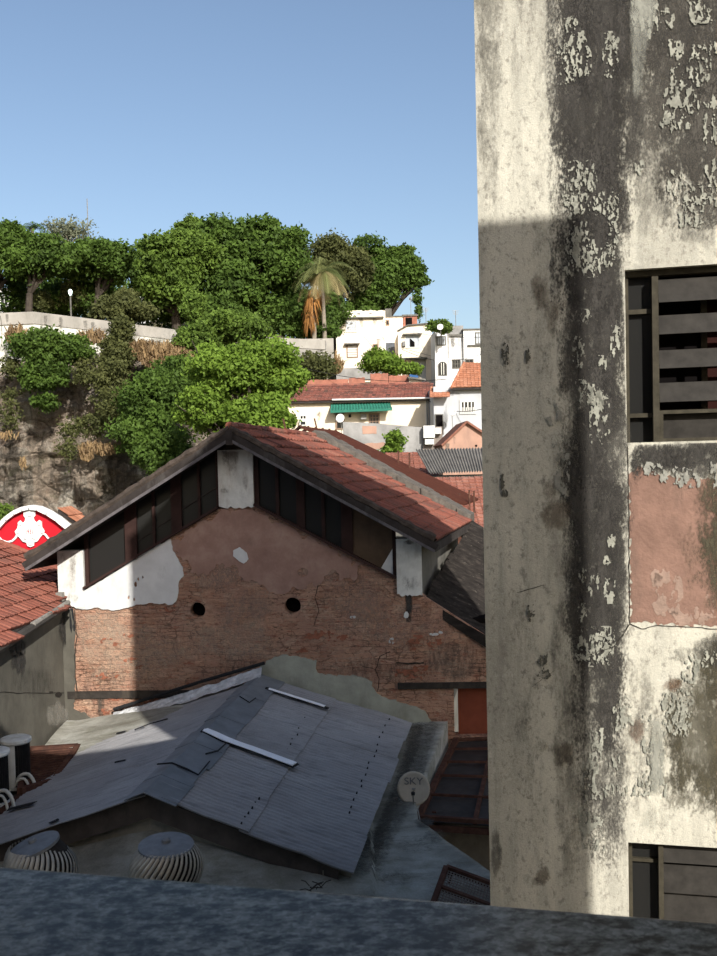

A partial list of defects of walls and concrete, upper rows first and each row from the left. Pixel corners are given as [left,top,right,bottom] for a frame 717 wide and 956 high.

peeling [557,16,619,85]
peeling [561,160,620,278]
water stain [542,0,717,859]
peeling [603,534,616,565]
flaking render [628,461,717,628]
flaking render [49,508,364,721]
peeling [260,629,431,723]
peeling [575,568,616,667]